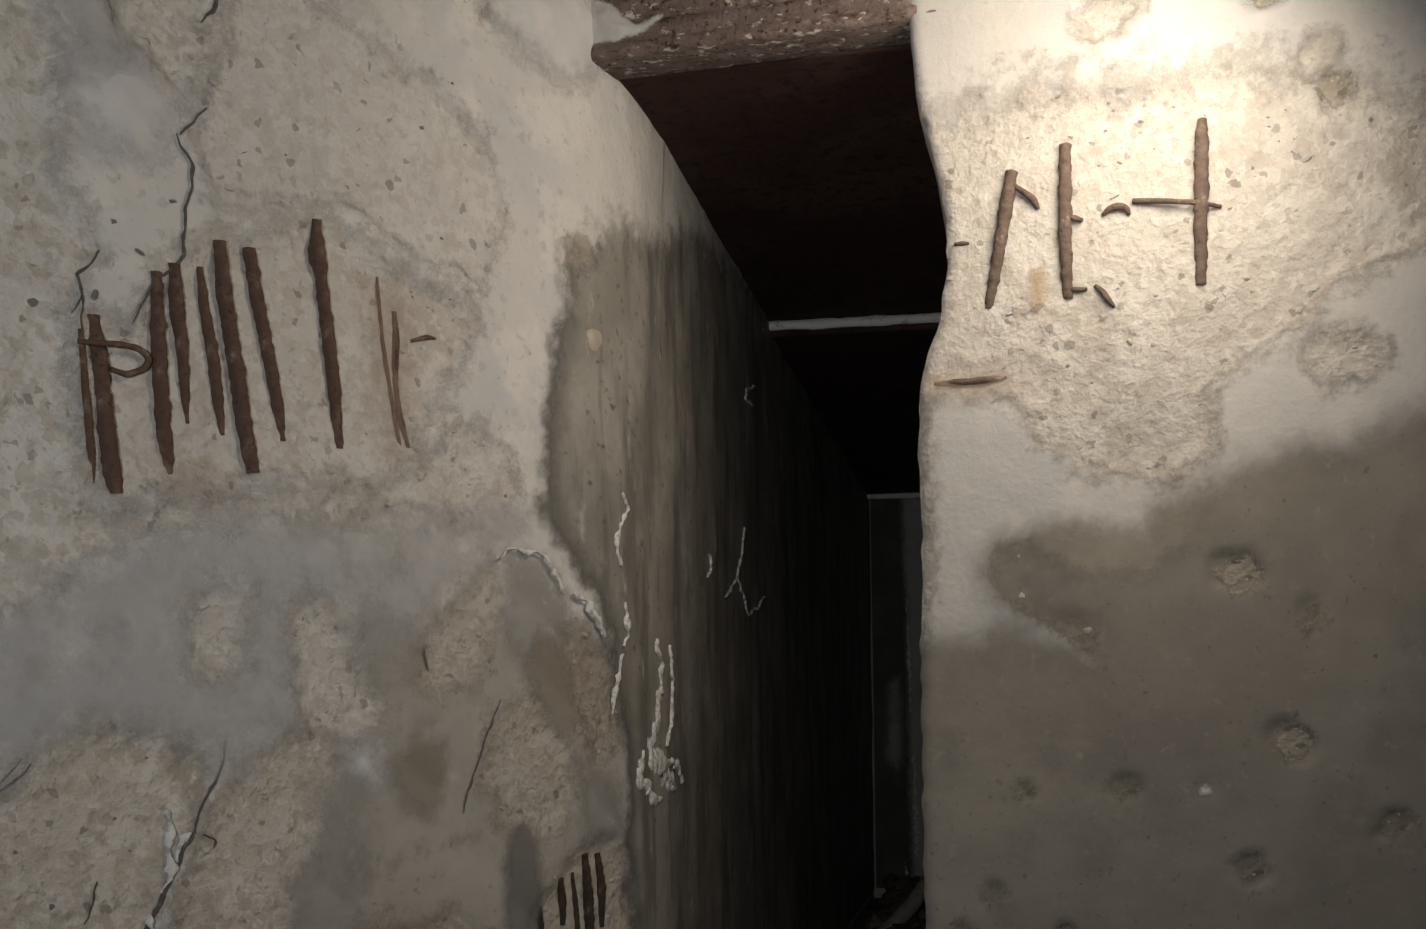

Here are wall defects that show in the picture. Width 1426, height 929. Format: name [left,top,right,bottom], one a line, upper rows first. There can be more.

crack [200,0,218,23]
spalling [1070,0,1151,48]
crack [71,250,99,337]
crack [132,108,207,324]
spalling [0,0,521,617]
spalling [915,28,1426,652]
spalling [406,550,504,703]
water stain [0,223,1426,929]
crack [84,881,98,924]
crack [144,742,226,929]
spalling [0,580,387,929]
spalling [473,622,636,929]